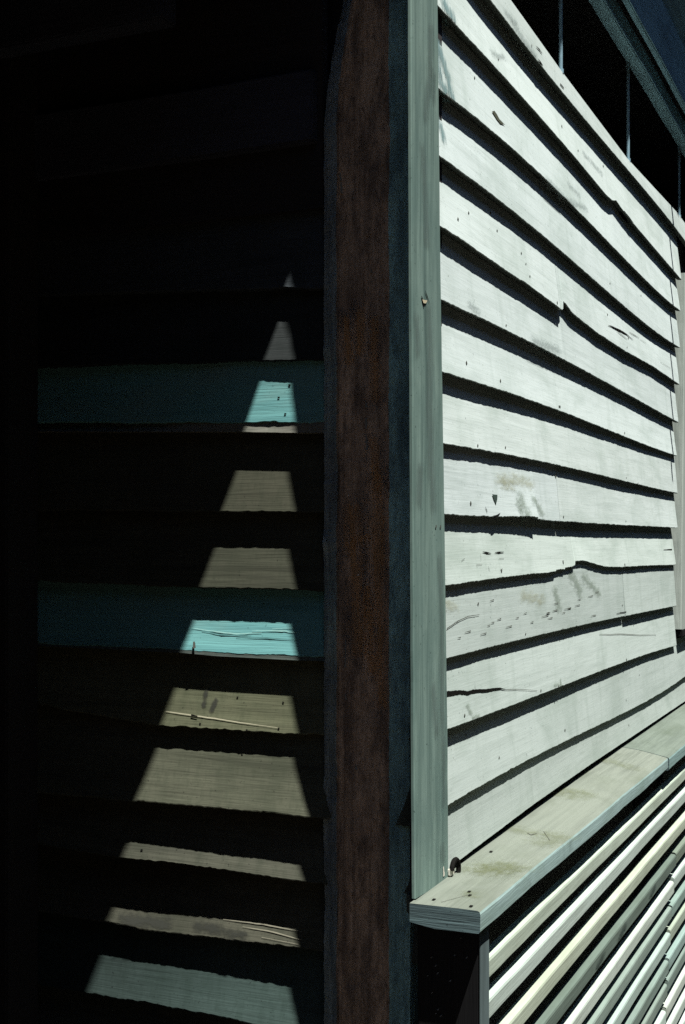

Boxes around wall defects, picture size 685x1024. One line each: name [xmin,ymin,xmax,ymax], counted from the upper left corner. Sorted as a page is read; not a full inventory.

crack [447,687,537,696]